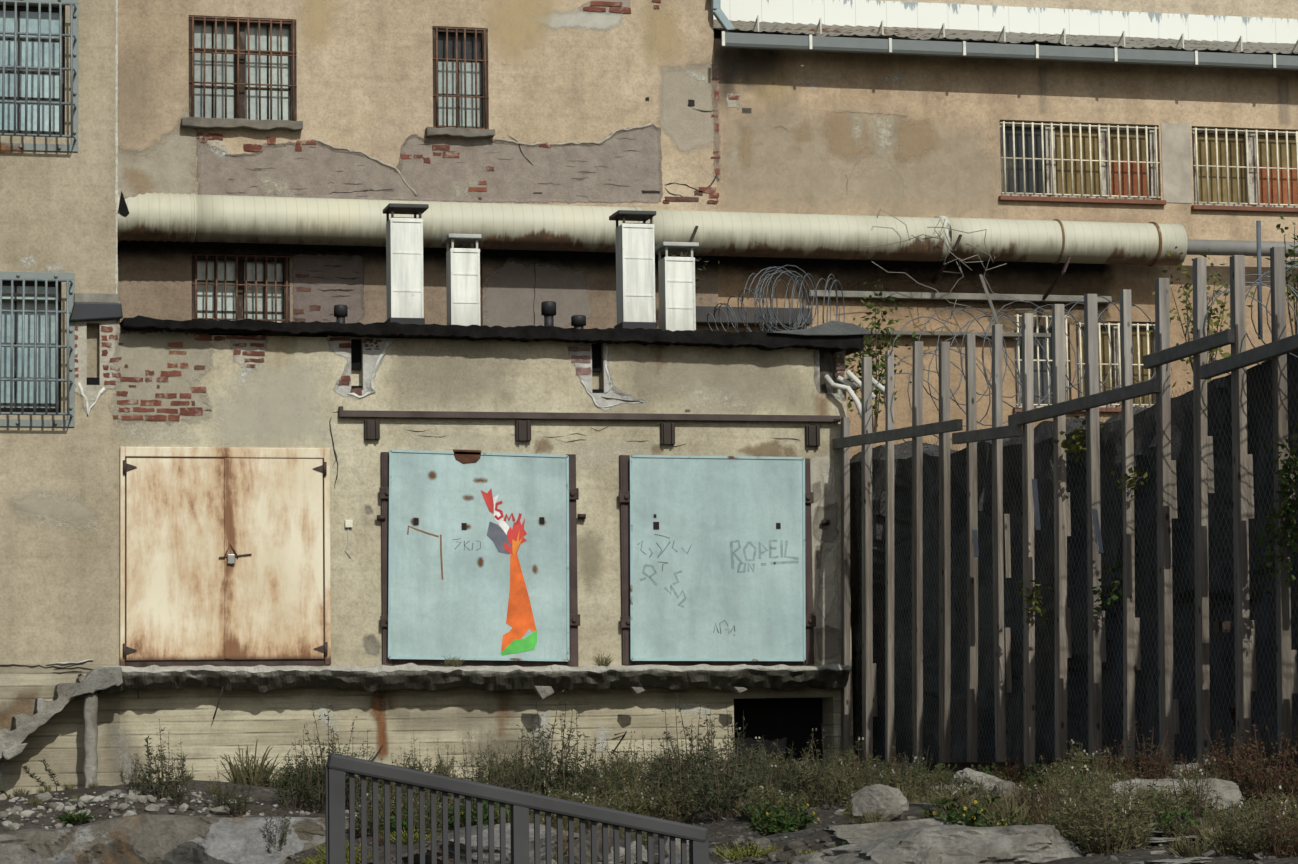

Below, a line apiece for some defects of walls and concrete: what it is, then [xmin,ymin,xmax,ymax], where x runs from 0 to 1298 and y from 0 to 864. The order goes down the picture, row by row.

flaking render [115,0,752,294]
flaking render [75,319,269,424]
flaking render [292,253,394,399]
flaking render [551,345,648,463]
rust [372,691,387,756]